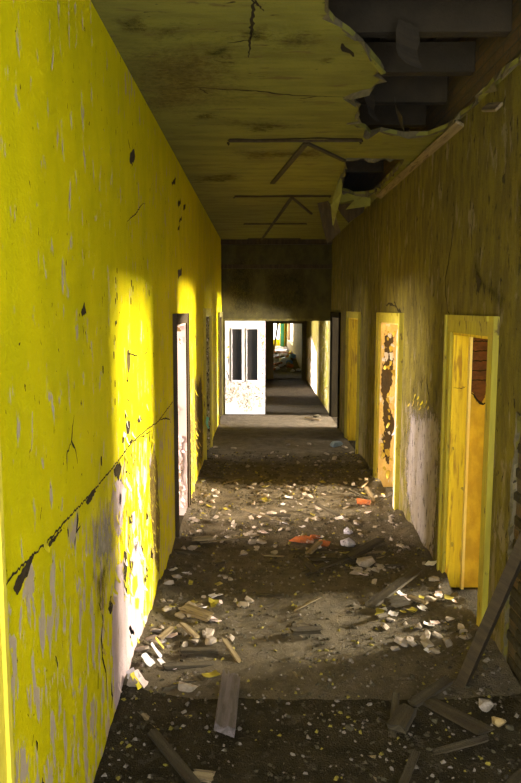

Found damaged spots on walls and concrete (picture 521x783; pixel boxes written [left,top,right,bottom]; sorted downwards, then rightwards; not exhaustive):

crack [6,401,173,708]
peeling [112,448,161,709]
peeling [178,374,209,509]
peeling [224,331,266,412]
peeling [380,329,441,558]
flaking render [501,569,521,684]
flaking render [507,411,521,559]